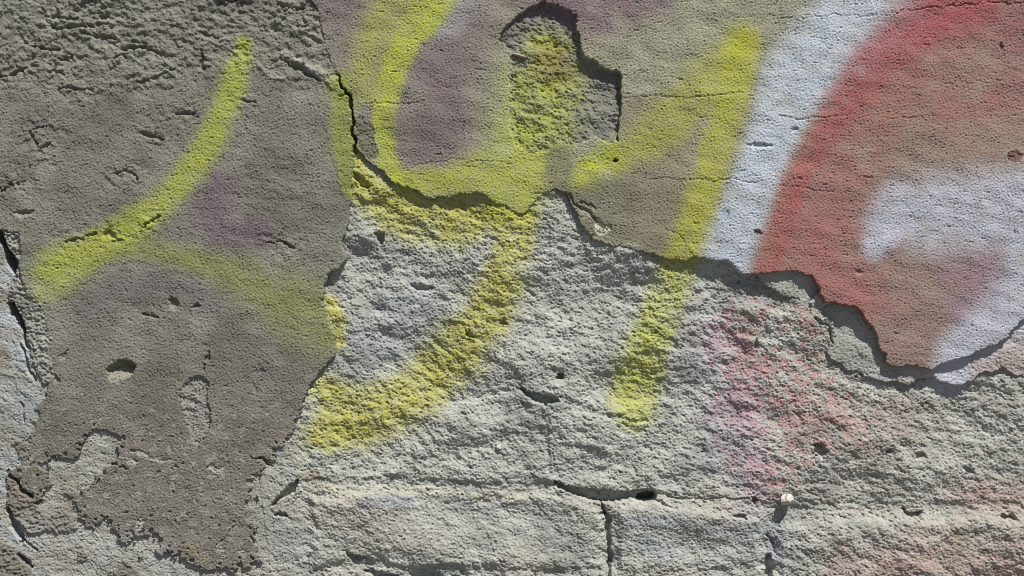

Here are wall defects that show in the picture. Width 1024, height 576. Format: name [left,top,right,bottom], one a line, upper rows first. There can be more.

crack [316,6,426,154]
spalling [506,21,621,145]
spalling [0,192,1024,576]
crack [553,480,737,576]